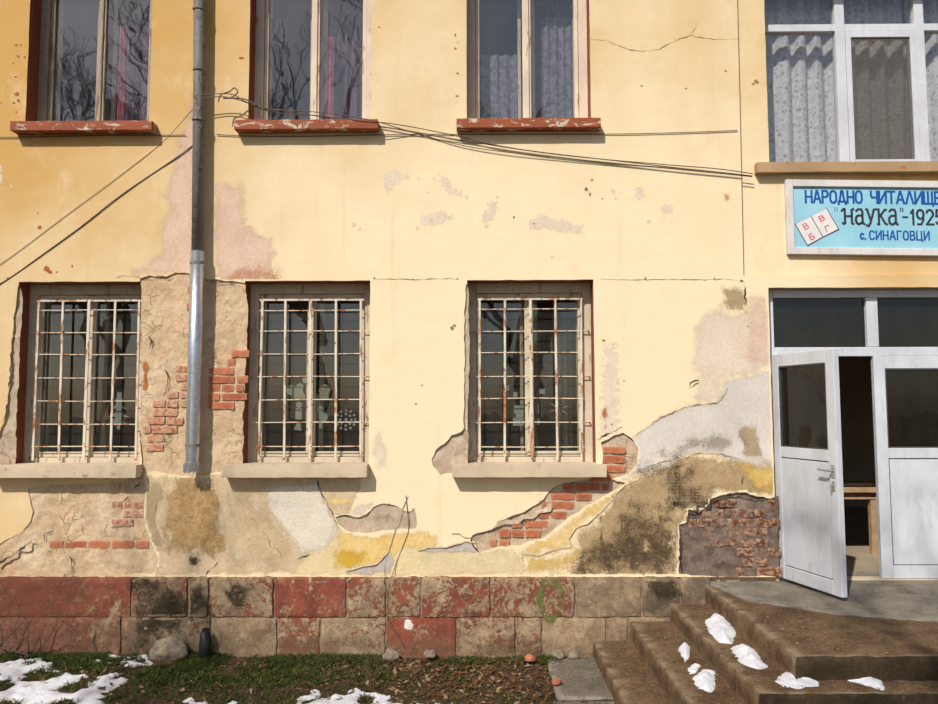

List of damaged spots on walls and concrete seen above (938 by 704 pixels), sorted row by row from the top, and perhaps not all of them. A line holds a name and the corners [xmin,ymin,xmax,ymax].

flaking render [0,100,284,652]
flaking render [432,278,470,475]
flaking render [296,339,673,576]
water stain [558,424,772,614]
flaking render [666,456,782,577]